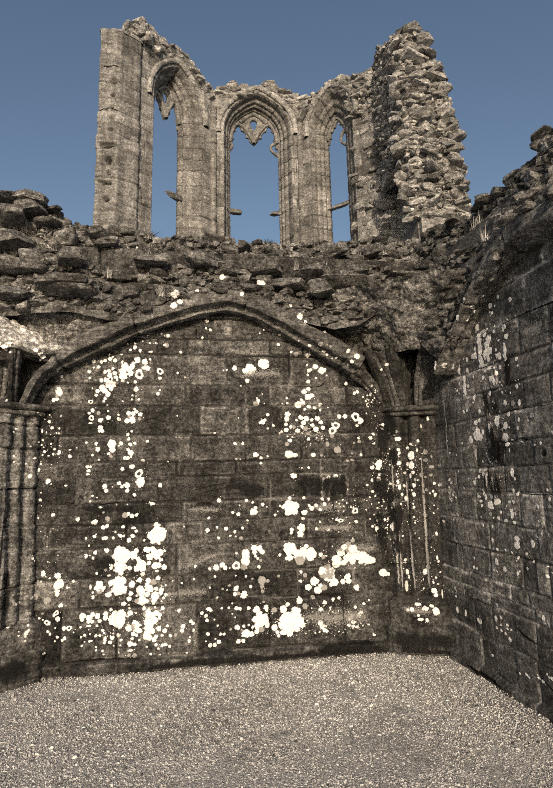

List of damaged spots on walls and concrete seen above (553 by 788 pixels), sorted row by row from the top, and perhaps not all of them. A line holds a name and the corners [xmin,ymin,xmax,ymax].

crack [504,301,553,323]
water stain [483,388,505,498]